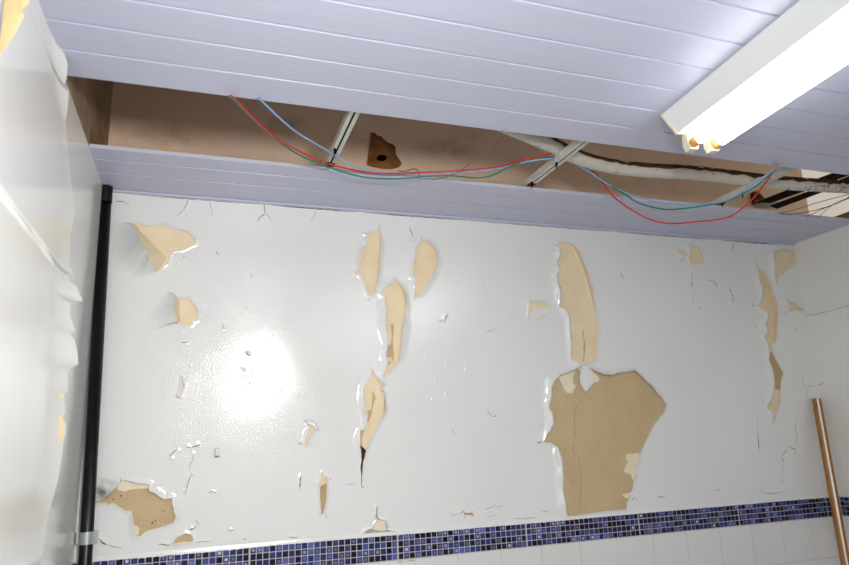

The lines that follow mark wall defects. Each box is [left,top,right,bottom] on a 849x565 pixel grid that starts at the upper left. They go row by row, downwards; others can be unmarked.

peeling [0,0,83,565]
peeling [112,220,200,278]
peeling [148,292,203,329]
peeling [351,222,444,486]
peeling [526,237,669,518]
peeling [753,247,805,426]
peeling [95,475,200,547]
peeling [315,469,330,517]